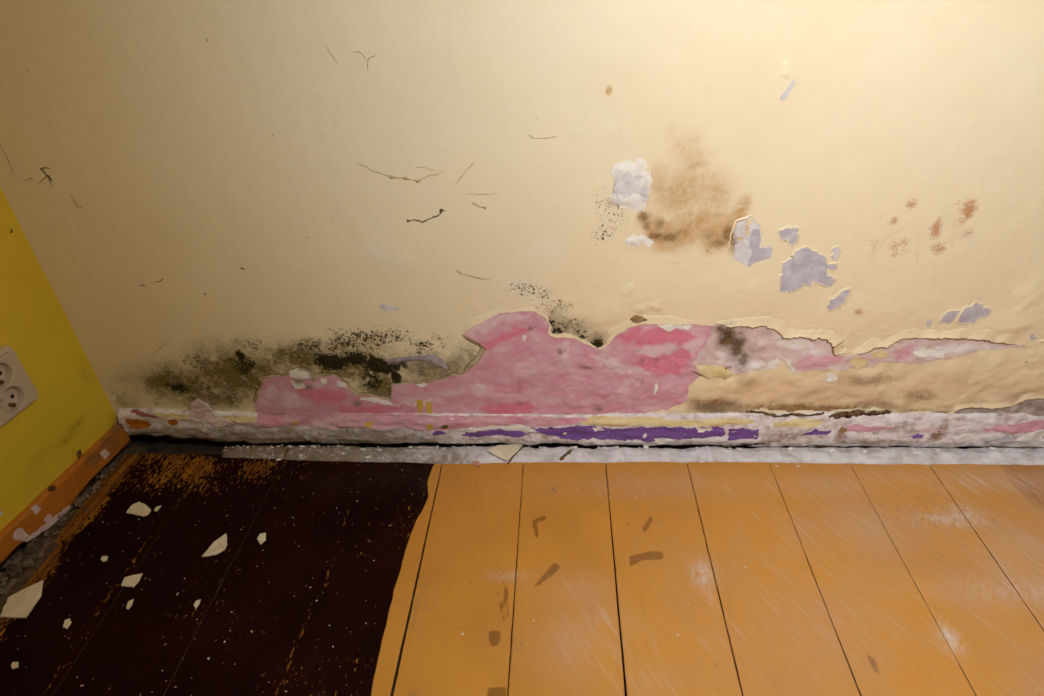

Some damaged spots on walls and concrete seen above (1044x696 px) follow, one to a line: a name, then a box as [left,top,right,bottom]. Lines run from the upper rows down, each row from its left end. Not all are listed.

water stain [584,105,776,264]
water stain [481,224,603,348]
peeling [728,215,852,312]
water stain [146,328,464,407]
peeling [125,301,1044,461]